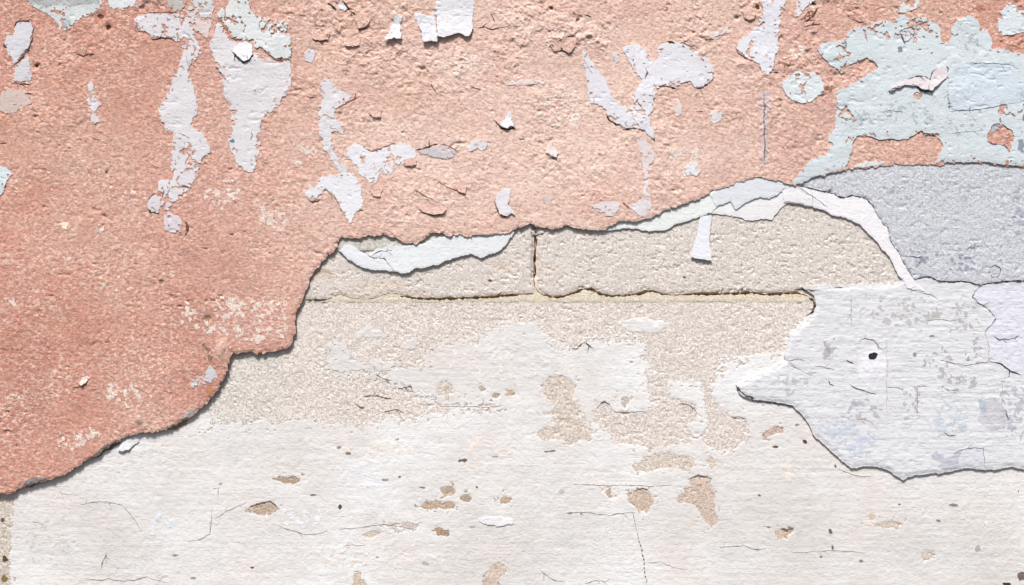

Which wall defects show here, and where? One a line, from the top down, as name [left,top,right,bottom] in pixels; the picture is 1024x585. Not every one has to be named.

peeling [27,0,330,233]
peeling [0,166,12,195]
flaking render [165,0,1024,540]
crack [400,238,918,429]
spalling [21,477,48,488]
peeling [89,434,142,459]
crack [542,571,609,583]
crack [569,483,685,585]